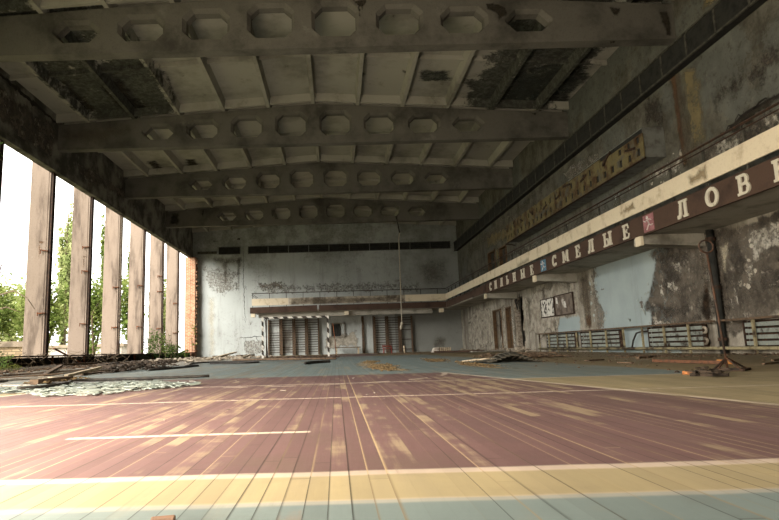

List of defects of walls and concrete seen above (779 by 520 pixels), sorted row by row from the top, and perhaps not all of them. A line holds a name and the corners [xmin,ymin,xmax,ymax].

leakage [683,69,779,161]
peeling [589,268,607,329]